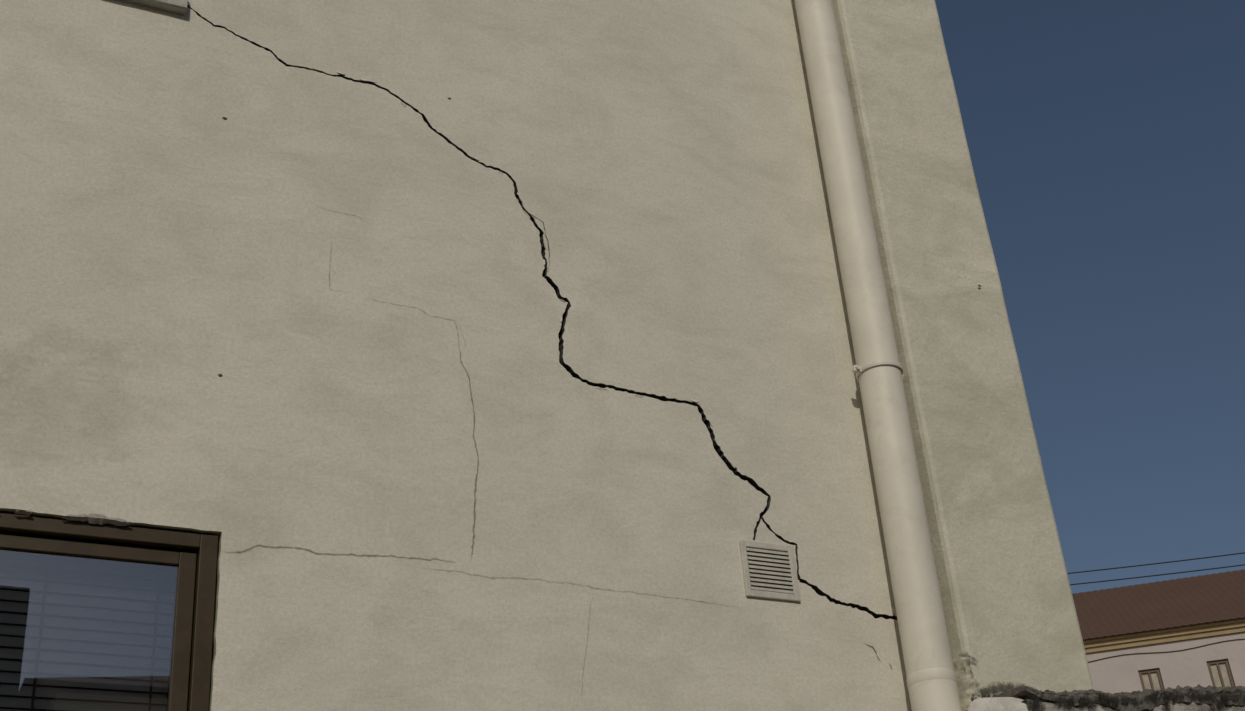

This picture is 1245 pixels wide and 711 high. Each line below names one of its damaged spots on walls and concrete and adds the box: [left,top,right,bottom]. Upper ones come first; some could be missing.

crack [187,5,897,659]